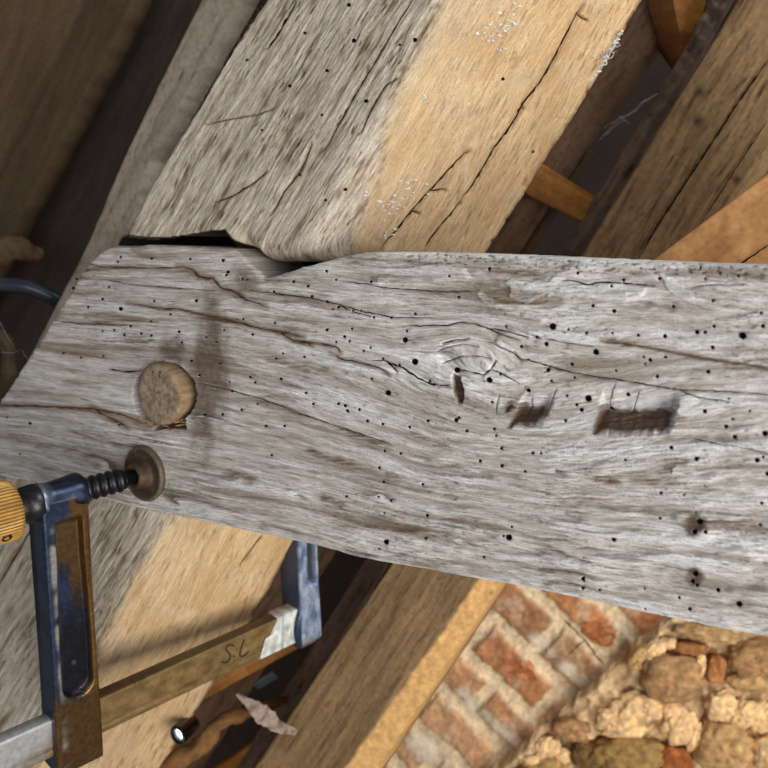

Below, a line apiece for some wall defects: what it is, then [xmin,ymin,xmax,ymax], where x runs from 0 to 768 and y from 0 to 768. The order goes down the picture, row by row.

crack [425,4,588,249]
crack [382,151,469,248]
crack [89,263,767,402]